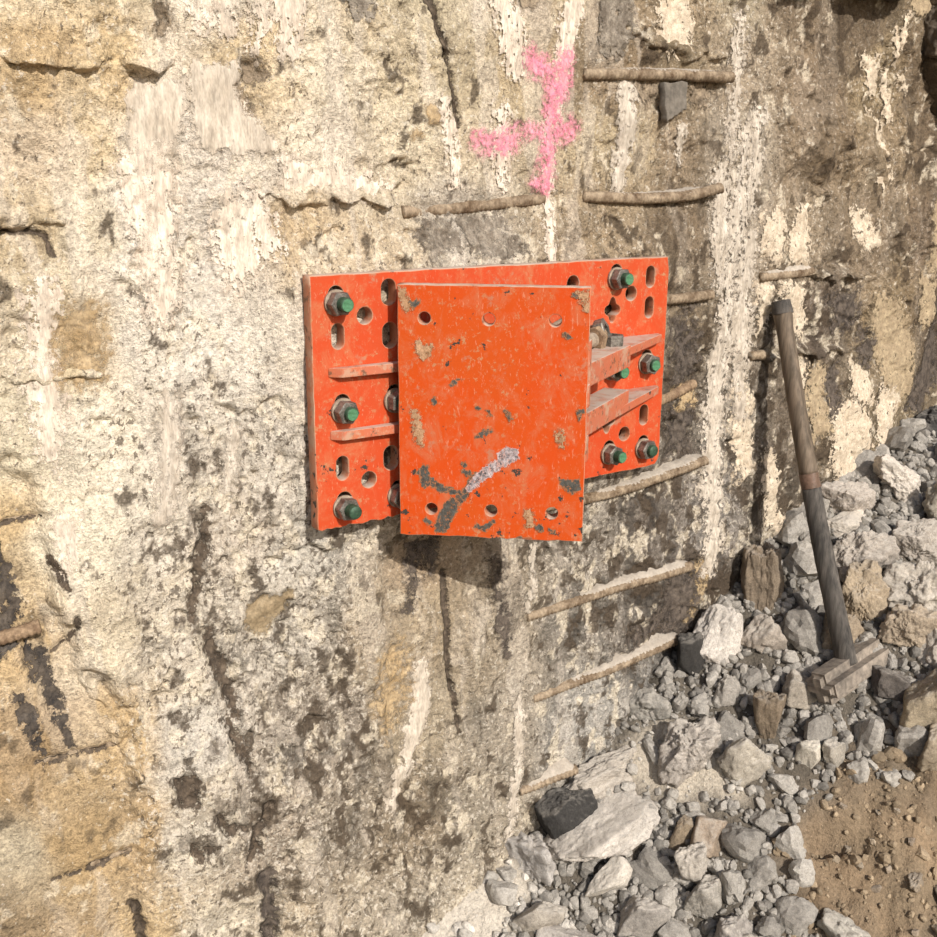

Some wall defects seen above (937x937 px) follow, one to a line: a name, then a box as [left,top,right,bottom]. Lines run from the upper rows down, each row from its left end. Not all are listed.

crack [423,0,461,129]
spalling [583,0,735,123]
spalling [582,183,724,205]
spalling [667,289,715,305]
spalling [662,379,697,405]
corrosion [670,383,698,411]
spalling [558,453,709,505]
spalling [527,560,694,622]
crack [439,568,462,735]
spalling [533,632,679,703]